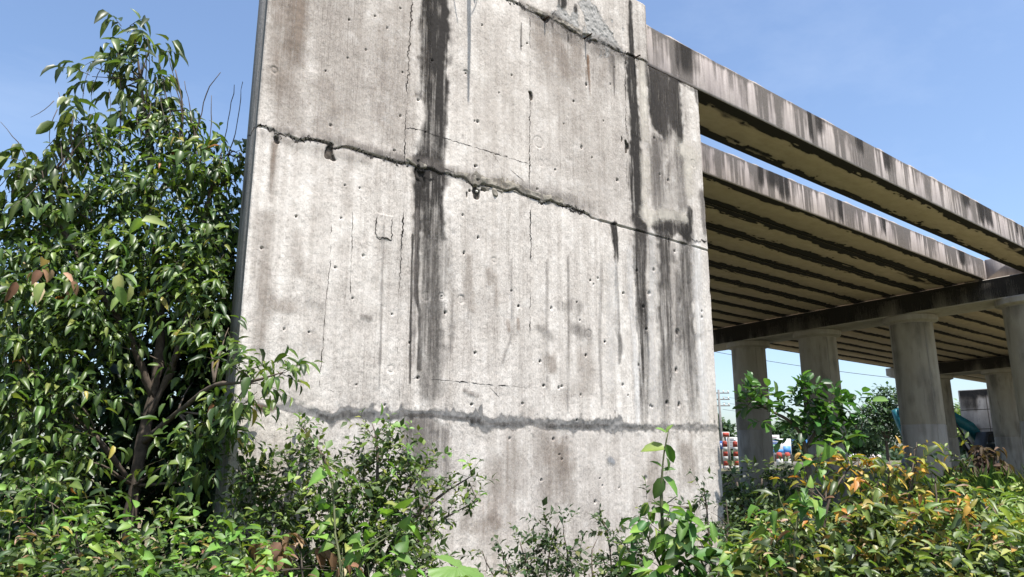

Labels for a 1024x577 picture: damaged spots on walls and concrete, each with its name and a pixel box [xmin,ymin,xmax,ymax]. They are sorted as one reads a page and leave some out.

water stain [340,0,473,383]
crack [249,2,589,259]
water stain [536,0,577,41]
peeling [540,0,626,65]
water stain [593,0,1024,428]